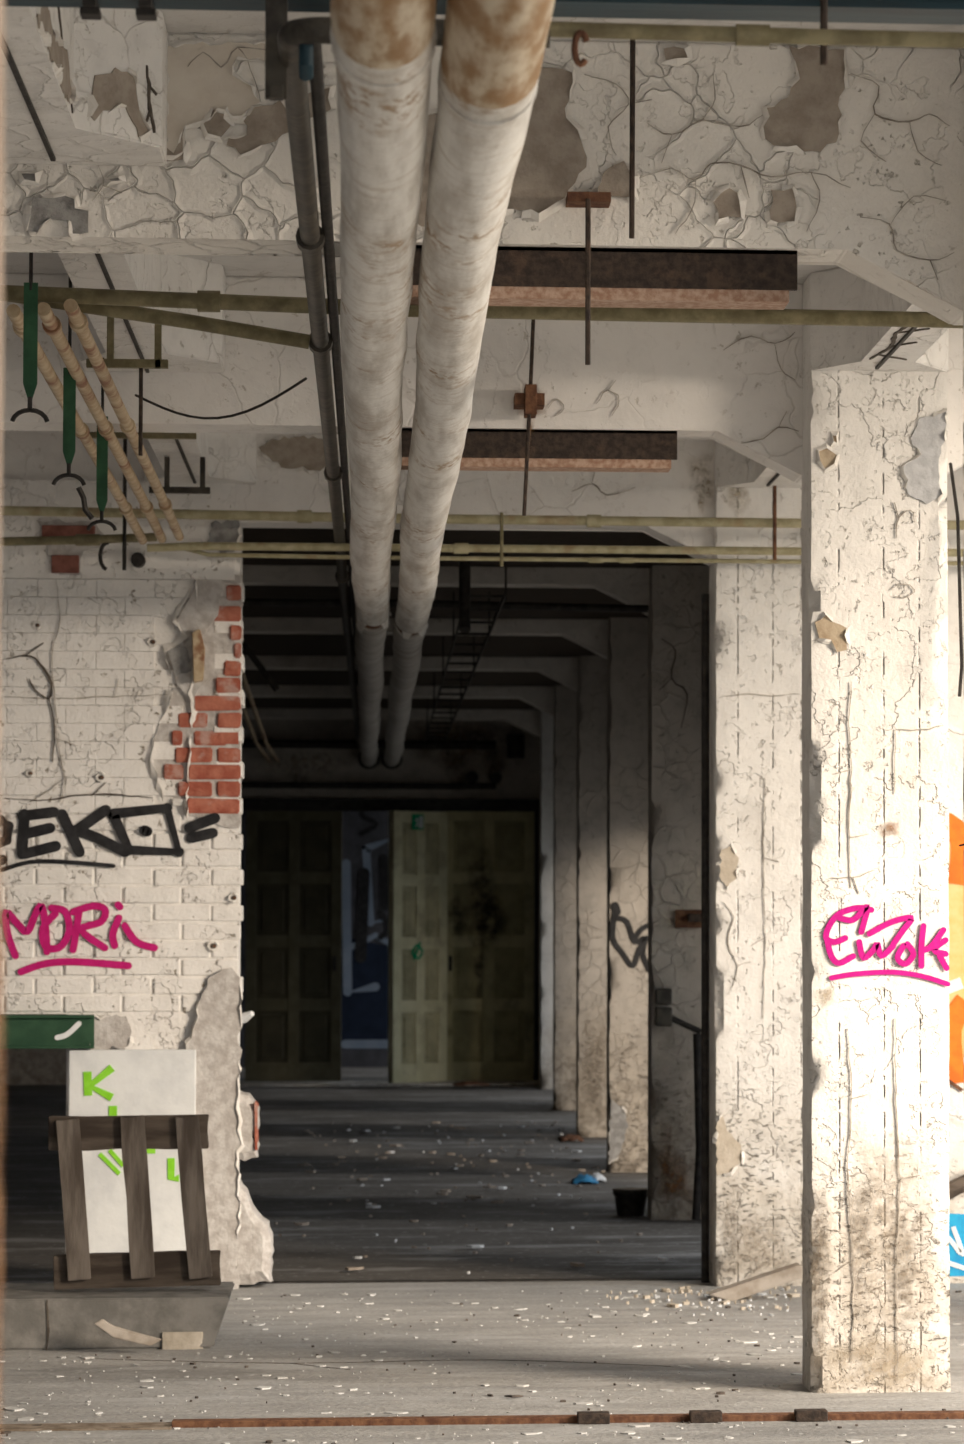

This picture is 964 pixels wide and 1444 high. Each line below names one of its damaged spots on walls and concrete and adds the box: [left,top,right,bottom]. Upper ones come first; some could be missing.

peeling [36,7,288,164]
peeling [307,81,337,118]
peeling [506,64,587,223]
peeling [592,161,640,202]
crack [584,73,954,280]
peeling [759,44,849,156]
peeling [900,408,948,504]
crack [894,502,915,538]
spalling [146,575,243,828]